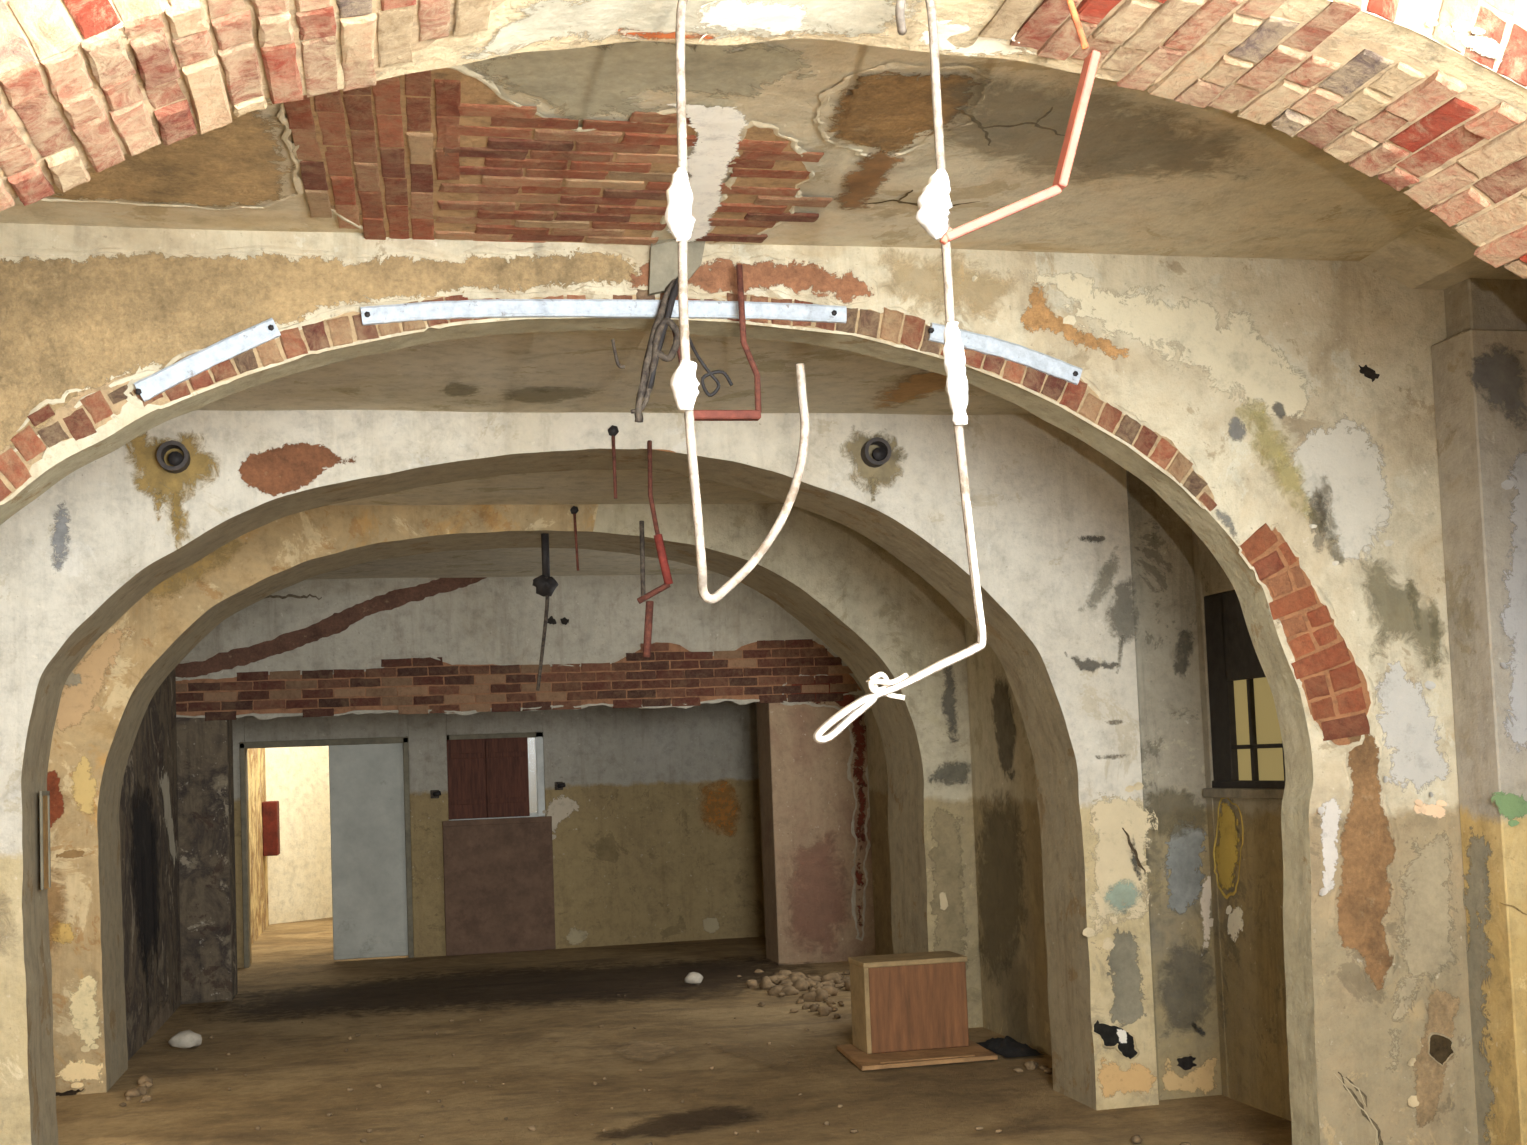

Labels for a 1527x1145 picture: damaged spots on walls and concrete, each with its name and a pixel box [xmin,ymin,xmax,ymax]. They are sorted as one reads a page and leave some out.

leakage [949,82,1226,180]
peeling [965,268,1394,566]
peeling [47,756,97,828]
leakage [131,781,160,1012]
peeling [159,766,177,868]
flaking render [175,577,871,941]
peeling [939,891,949,912]
peeling [1083,782,1158,953]
peeling [1200,798,1244,956]
flaking render [1239,523,1451,999]